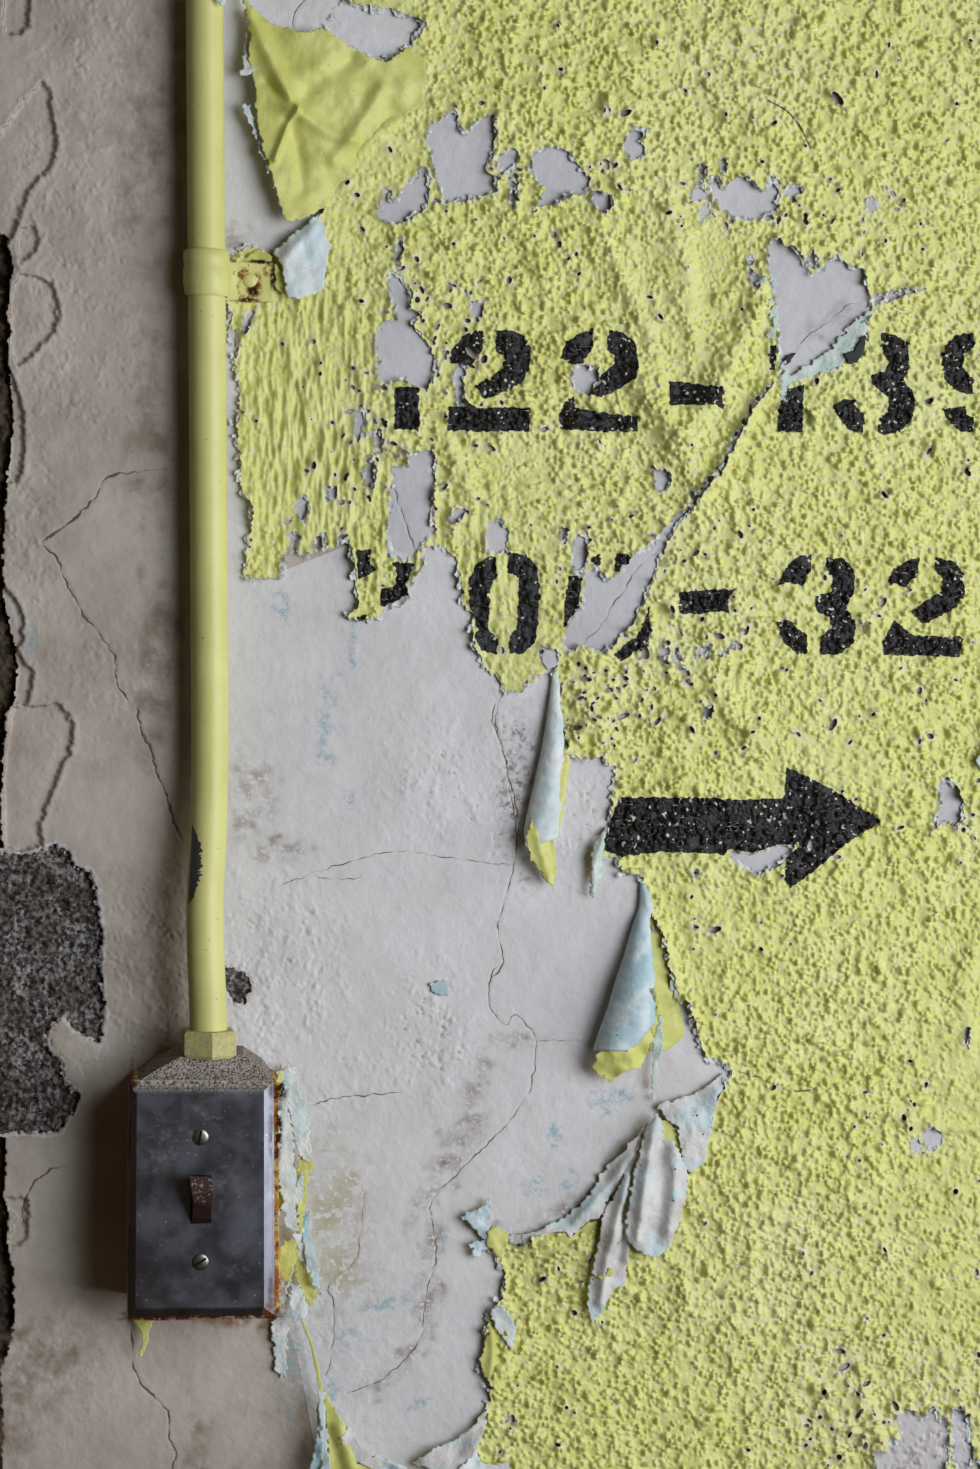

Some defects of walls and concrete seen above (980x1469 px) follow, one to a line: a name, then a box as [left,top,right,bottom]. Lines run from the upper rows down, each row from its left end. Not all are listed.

rust [238,260,275,302]
peeling [216,0,614,407]
peeling [623,126,649,162]
peeling [690,157,804,223]
peeling [862,196,879,214]
spalling [0,81,110,1469]
crack [42,469,181,838]
peeling [224,238,926,1469]
crack [280,696,578,1392]
peeling [873,1406,980,1469]